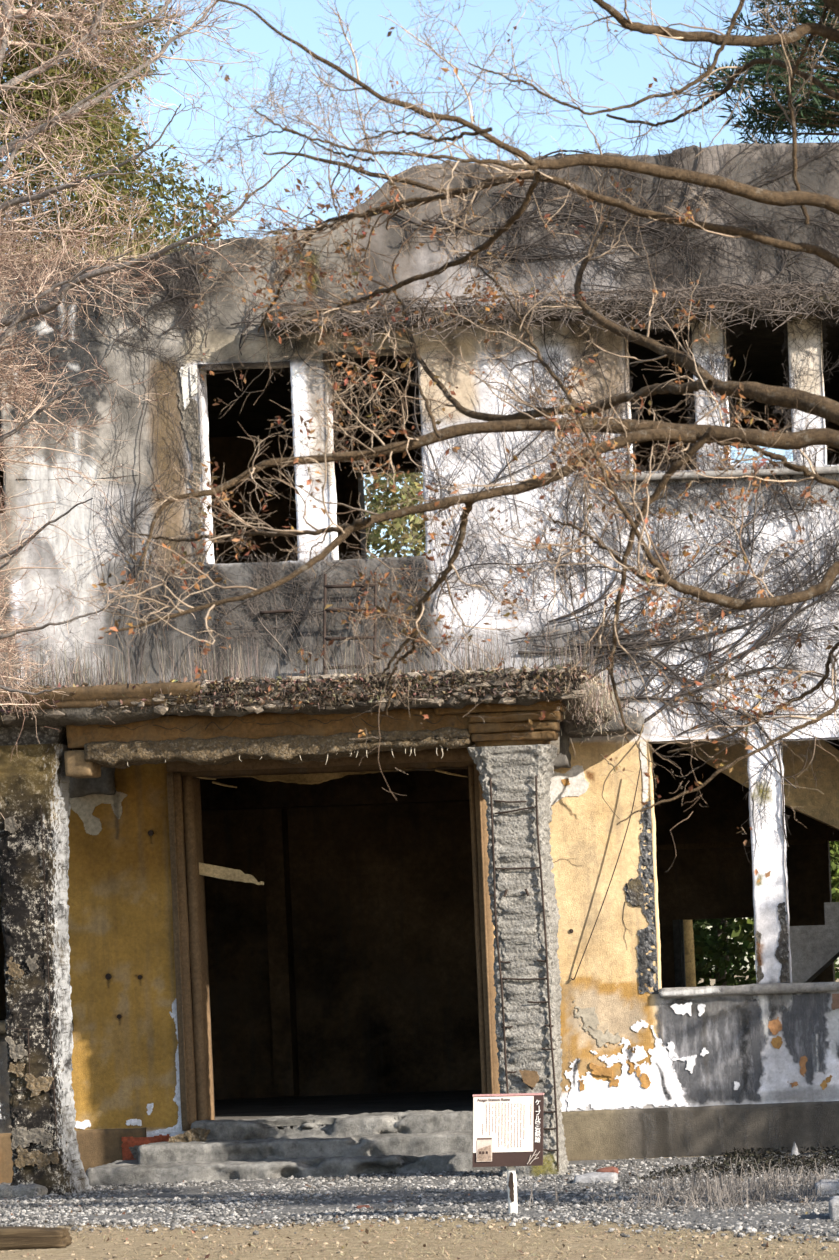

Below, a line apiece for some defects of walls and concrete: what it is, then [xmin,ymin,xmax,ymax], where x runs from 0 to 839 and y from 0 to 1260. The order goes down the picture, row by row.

damp [725,153,830,265]
damp [3,253,107,634]
spalling [0,727,688,1198]
spalling [755,902,790,1049]
peeling [790,1055,808,1087]